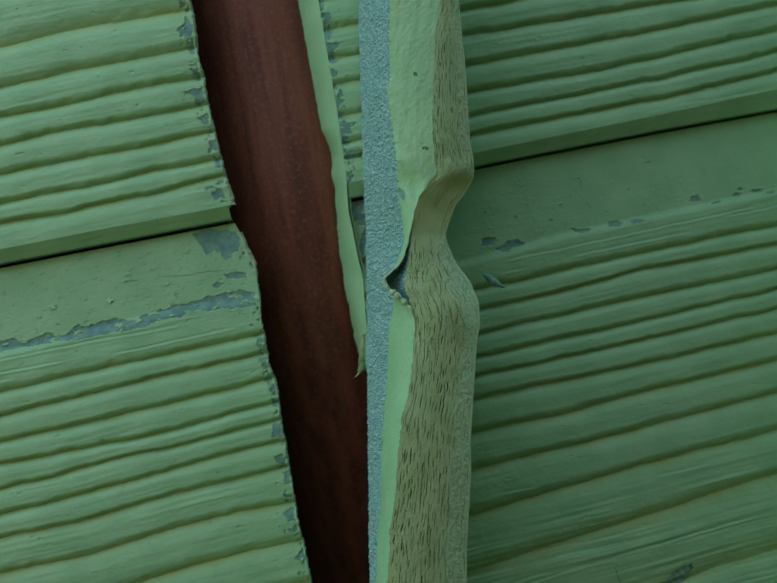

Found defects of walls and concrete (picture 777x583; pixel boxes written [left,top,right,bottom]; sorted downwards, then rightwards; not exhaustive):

peeling [193,228,245,260]
peeling [0,263,281,438]